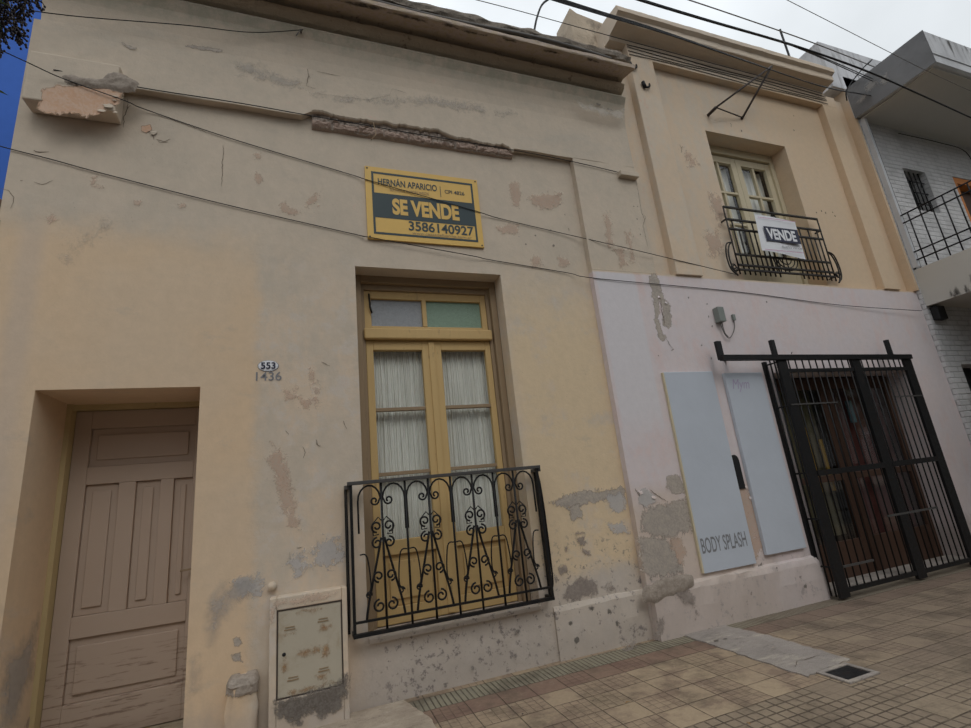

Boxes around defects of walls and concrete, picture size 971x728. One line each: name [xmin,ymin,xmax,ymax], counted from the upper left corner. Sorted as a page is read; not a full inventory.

peeling [37,72,139,118]
spalling [312,114,513,159]
peeling [649,274,672,341]
peeling [551,475,694,603]
leakage [274,674,350,726]